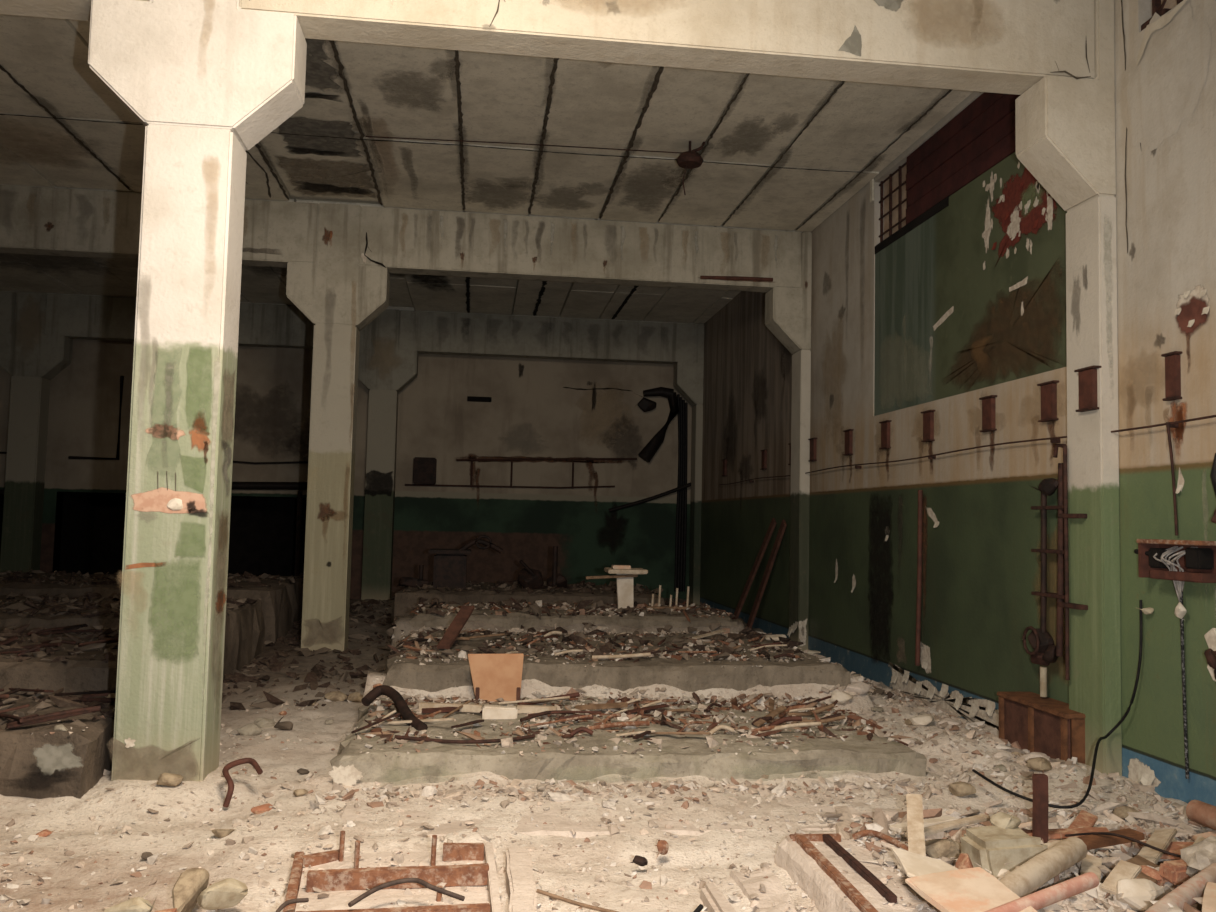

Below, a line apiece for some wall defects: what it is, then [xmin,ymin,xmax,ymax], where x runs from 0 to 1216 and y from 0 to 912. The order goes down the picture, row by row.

spalling [874,0,902,11]
peeling [982,162,1057,270]
peeling [132,348,220,659]
corrosion [318,504,335,521]